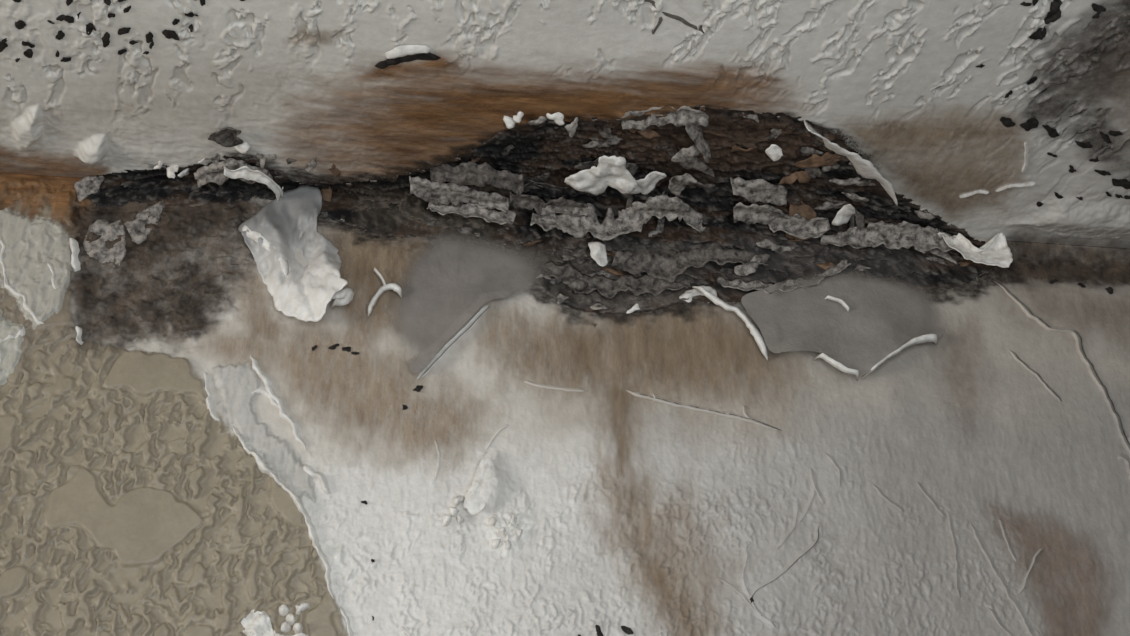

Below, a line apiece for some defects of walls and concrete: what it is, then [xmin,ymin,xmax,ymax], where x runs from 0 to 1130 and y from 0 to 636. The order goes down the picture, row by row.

leakage [15,20,35,62]
leakage [47,0,206,62]
rust [0,151,105,219]
leakage [229,132,497,189]
rust [297,59,772,175]
leakage [816,0,1130,208]
leakage [317,211,522,327]
spalling [0,104,1013,386]
leakage [488,266,753,384]
leakage [844,237,1130,302]
crack [996,282,1130,481]
peeling [203,355,354,636]